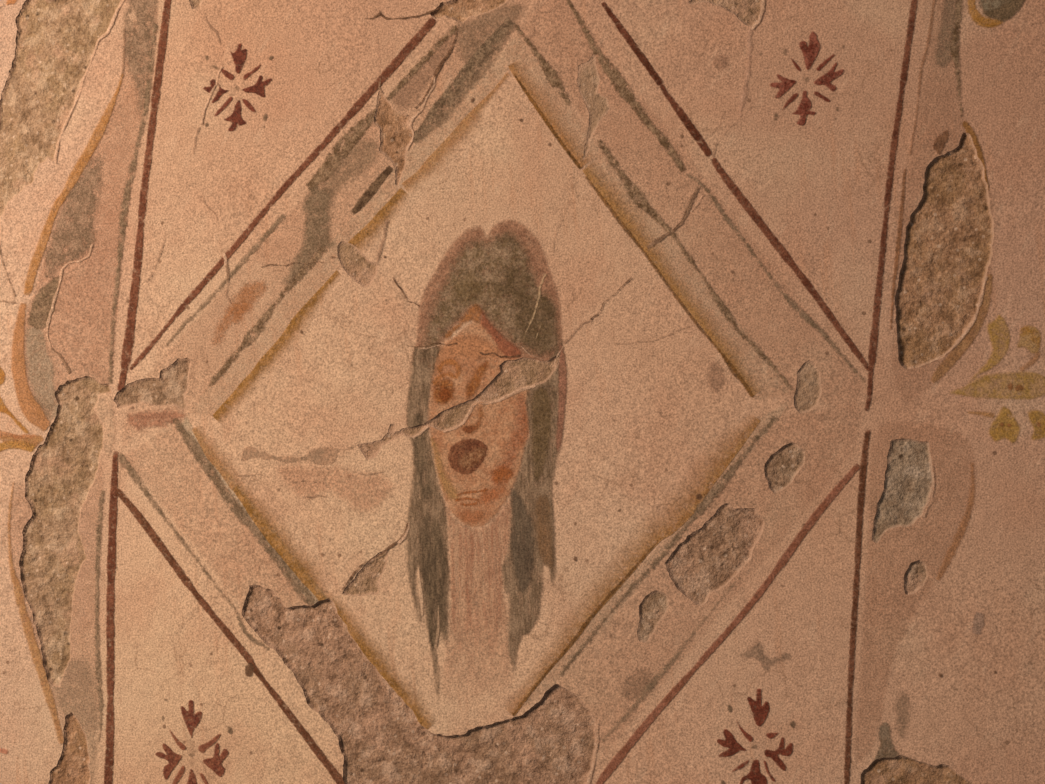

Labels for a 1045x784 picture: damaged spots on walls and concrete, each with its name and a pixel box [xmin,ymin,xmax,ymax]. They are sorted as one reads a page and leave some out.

flaking render [189,0,203,10]
flaking render [430,0,507,23]
flaking render [689,0,765,30]
flaking render [0,0,124,216]
flaking render [895,130,994,369]
flaking render [19,358,192,688]
flaking render [637,503,765,643]
flaking render [872,438,934,543]
flaking render [242,551,599,784]
flaking render [48,712,91,784]
flaking render [861,723,973,784]